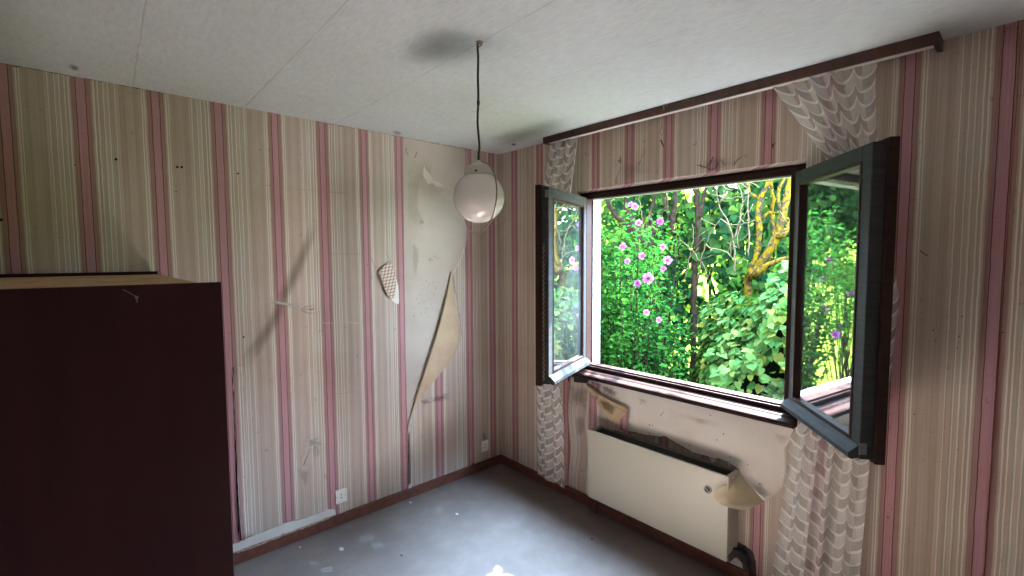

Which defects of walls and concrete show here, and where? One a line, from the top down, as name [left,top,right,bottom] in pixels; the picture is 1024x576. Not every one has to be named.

flaking render [403,138,466,434]
flaking render [591,381,793,501]